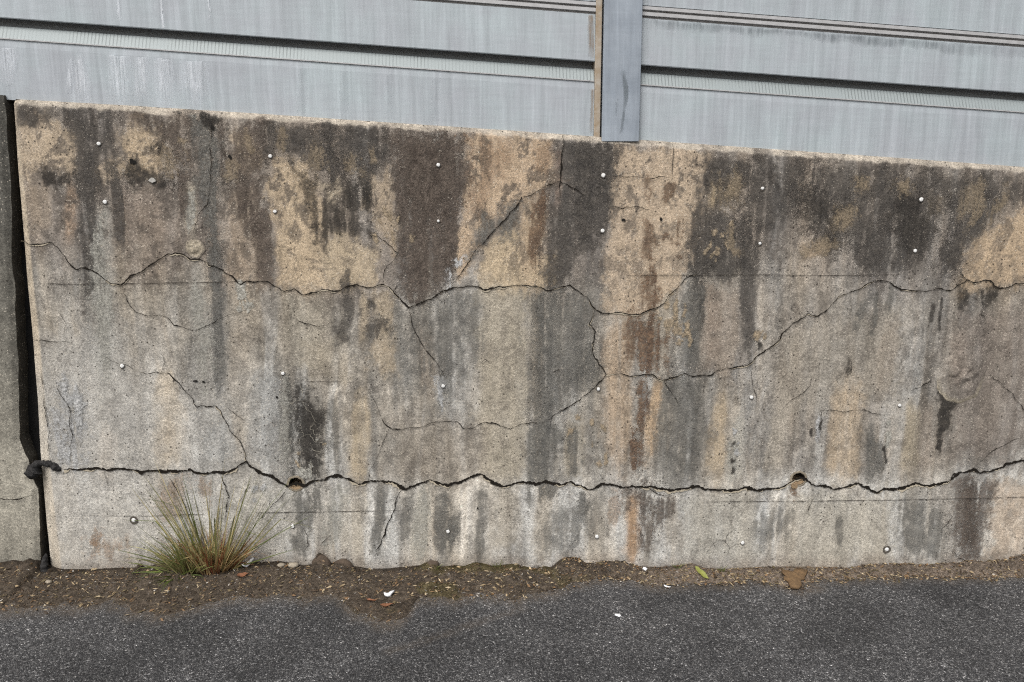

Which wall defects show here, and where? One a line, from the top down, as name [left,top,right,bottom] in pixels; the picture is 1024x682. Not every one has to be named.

leakage [15,103,520,406]
leakage [279,376,352,558]
crack [21,128,1024,550]
leakage [518,140,626,551]
leakage [621,377,714,552]
leakage [680,153,1024,367]